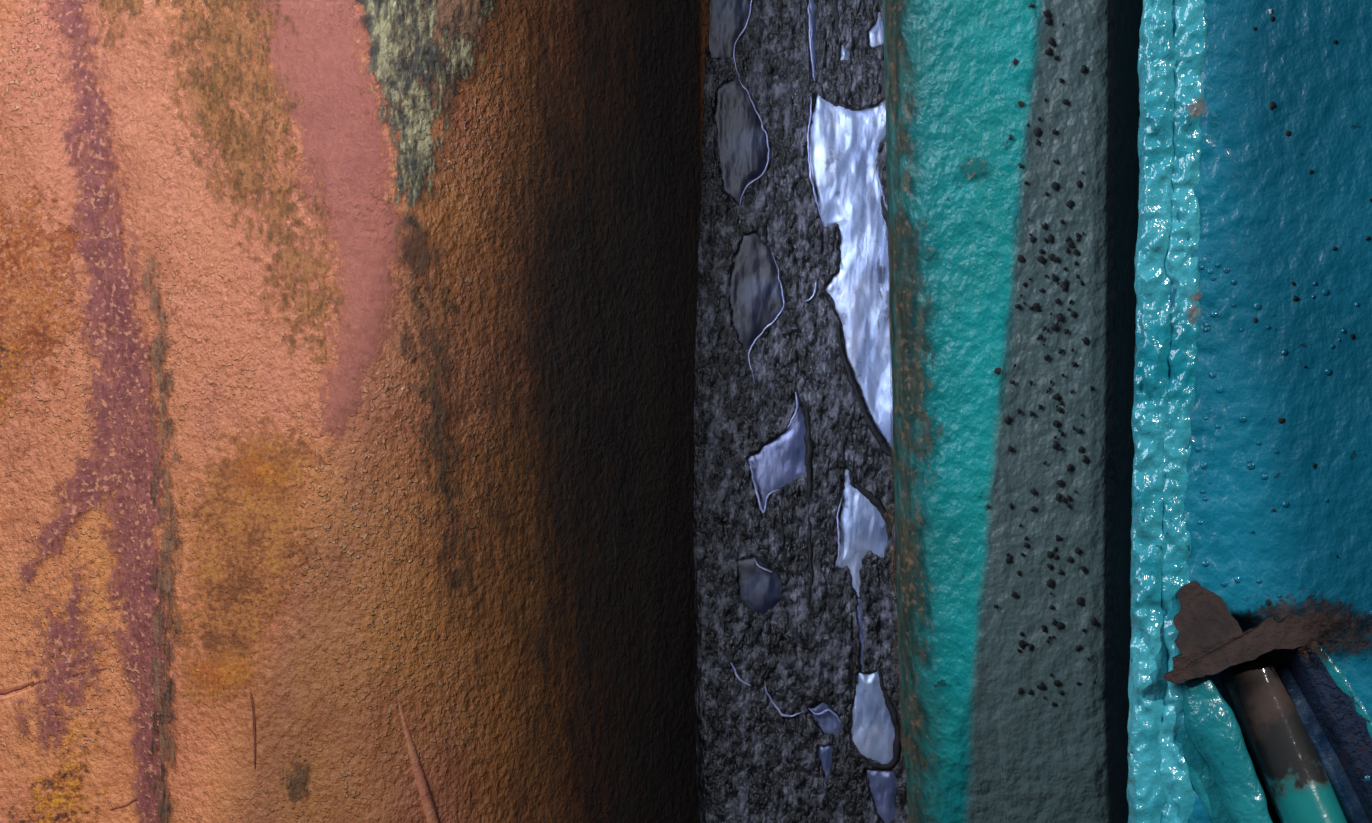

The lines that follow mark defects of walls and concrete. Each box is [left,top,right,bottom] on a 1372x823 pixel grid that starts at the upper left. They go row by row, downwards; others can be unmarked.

peeling [709,0,771,206]
peeling [730,233,787,384]
peeling [748,392,814,513]
peeling [807,0,893,457]
corrosion [877,0,943,823]
crack [0,668,106,701]
peeling [808,468,901,823]
corrosion [1237,591,1372,666]